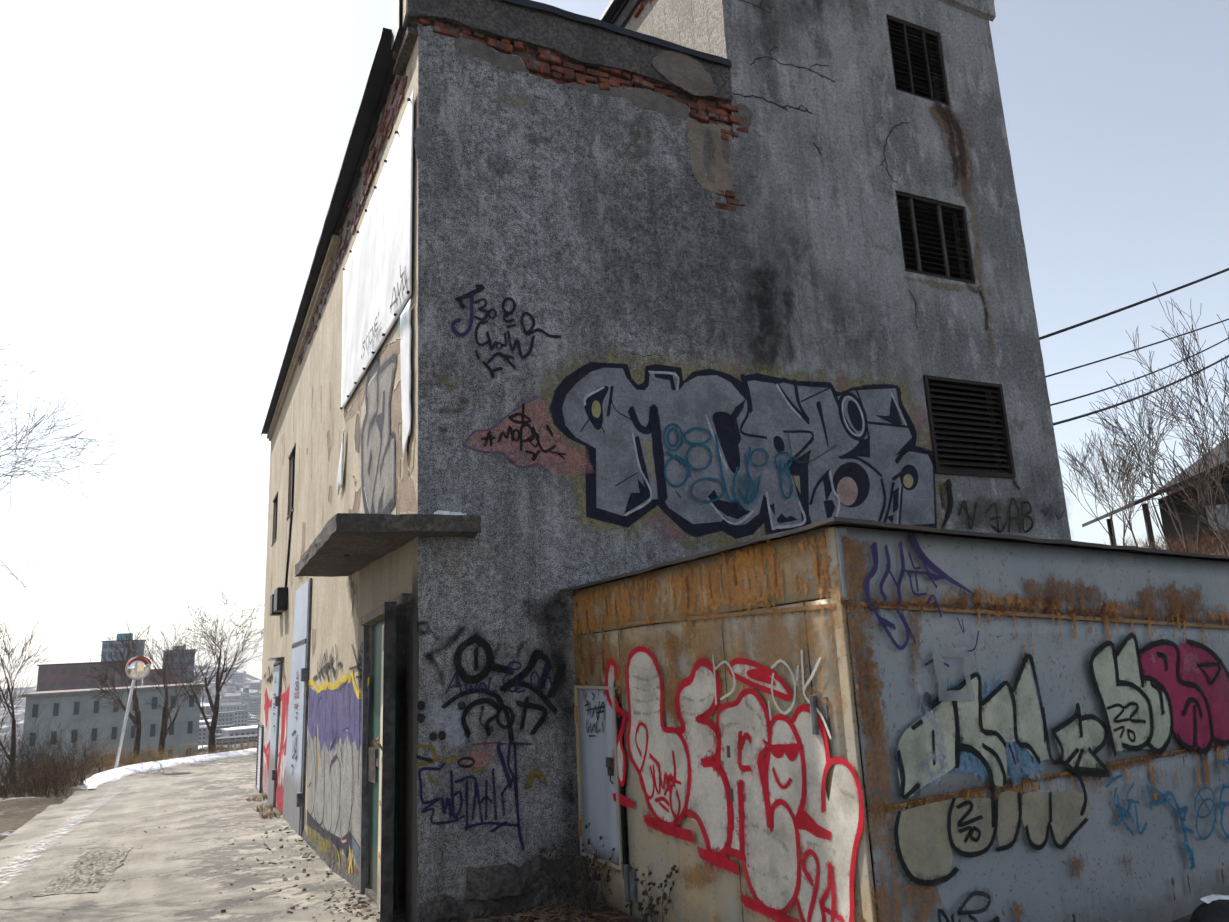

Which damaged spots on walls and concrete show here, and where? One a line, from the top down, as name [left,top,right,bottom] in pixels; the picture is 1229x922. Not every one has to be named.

flaking render [298,67,441,365]
flaking render [418,18,754,212]
crack [732,92,813,114]
crack [750,47,835,82]
crack [879,122,910,183]
rust [927,102,993,352]
rust [572,532,1229,922]